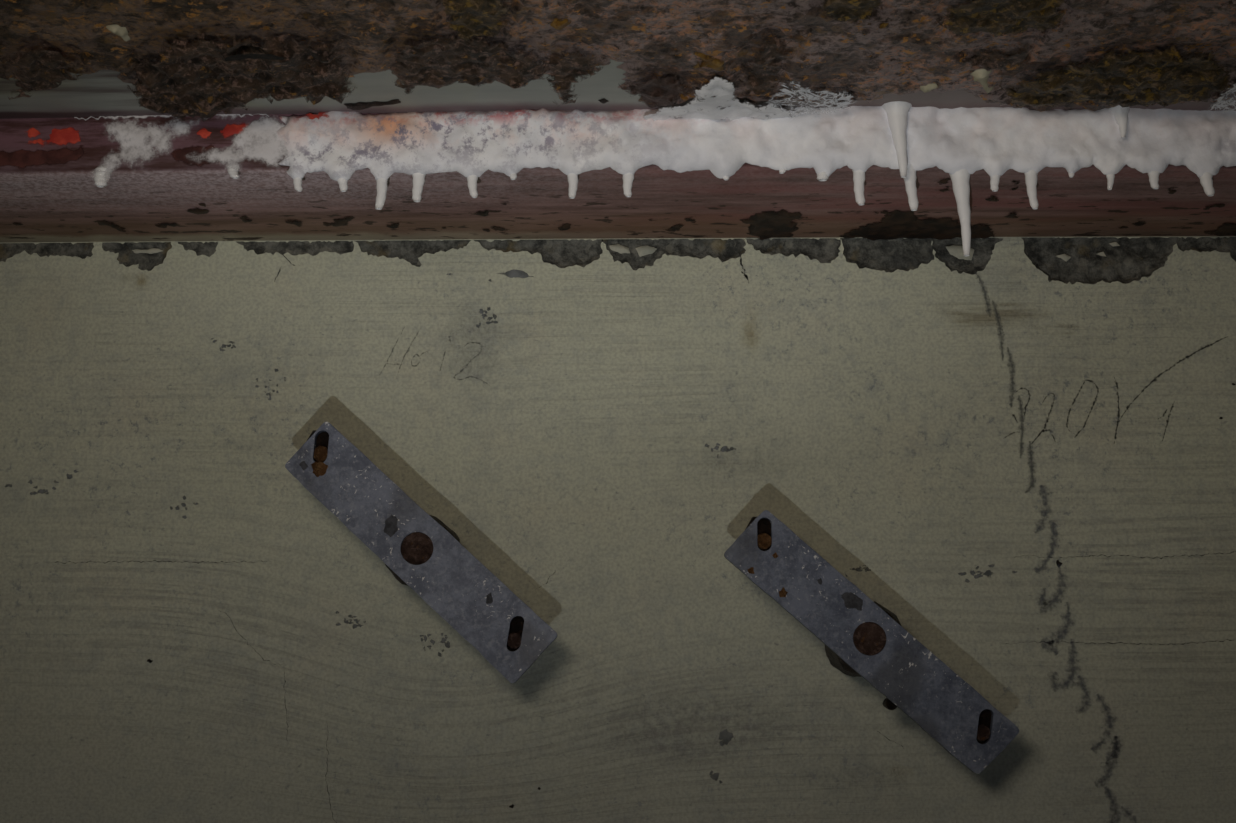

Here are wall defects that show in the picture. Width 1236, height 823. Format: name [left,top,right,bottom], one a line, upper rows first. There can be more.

corrosion [0,0,1236,120]
damp [277,77,1236,256]
spalling [0,242,218,271]
peeling [488,269,533,281]
spalling [235,238,1003,275]
spalling [1020,237,1236,284]